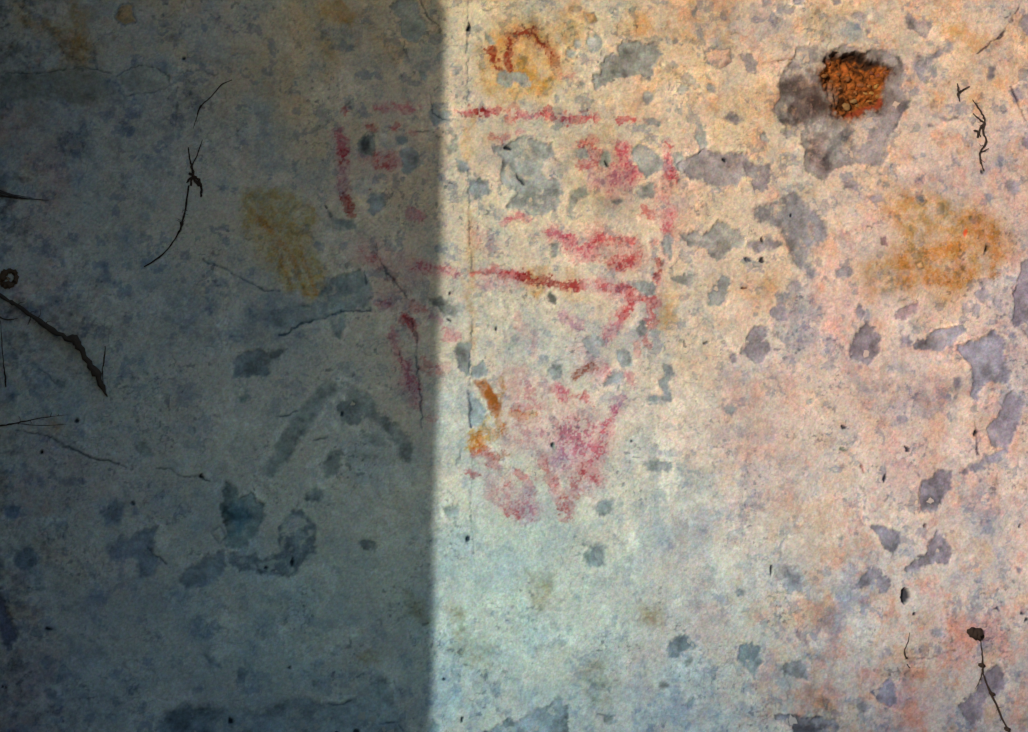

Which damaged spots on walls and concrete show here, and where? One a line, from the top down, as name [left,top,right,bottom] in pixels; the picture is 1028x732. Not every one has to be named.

peeling [760,9,956,205]
rust [804,45,914,138]
rust [843,176,1018,312]
peeling [156,672,411,732]
peeling [481,694,571,732]
peeling [774,714,842,732]